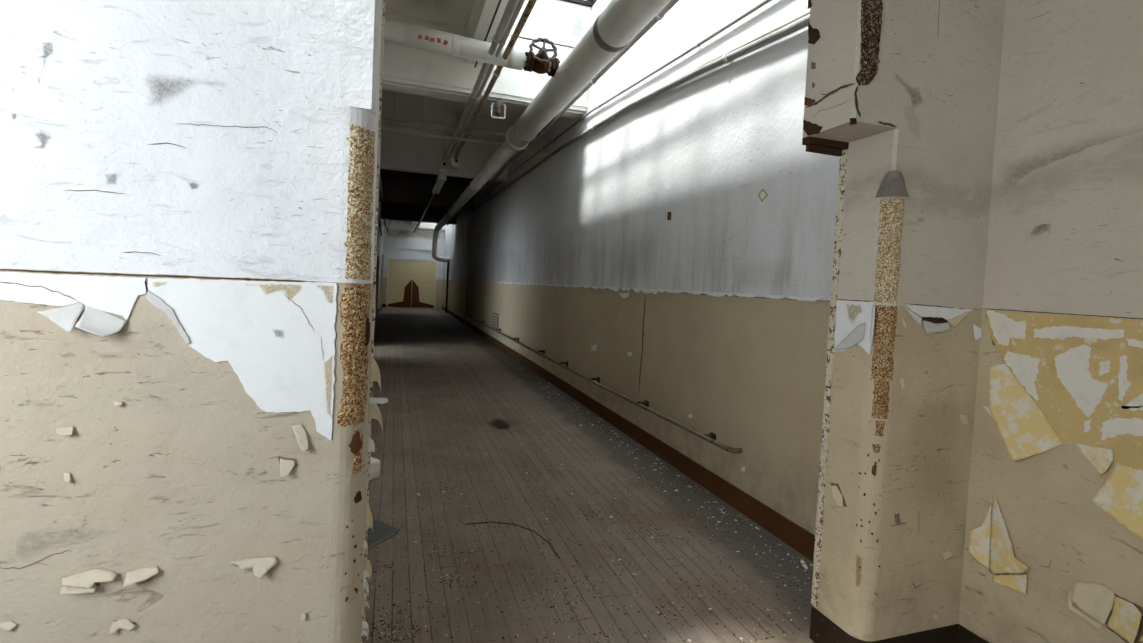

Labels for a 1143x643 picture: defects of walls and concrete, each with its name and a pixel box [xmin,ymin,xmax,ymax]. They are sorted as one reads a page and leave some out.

spalling [808,23,821,45]
spalling [804,61,816,107]
crack [807,83,896,127]
spalling [803,120,823,136]
peeling [0,124,388,477]
peeling [498,170,1143,470]
crack [904,303,1143,319]
peeling [59,566,159,594]